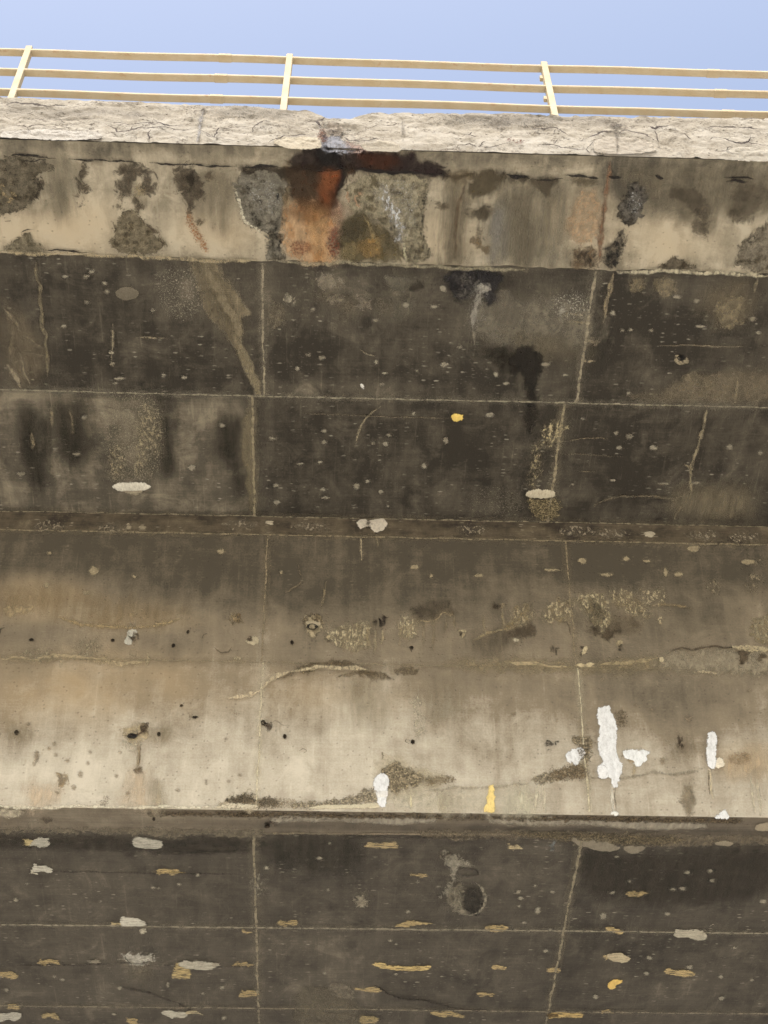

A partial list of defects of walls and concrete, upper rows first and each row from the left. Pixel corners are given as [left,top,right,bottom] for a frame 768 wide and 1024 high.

spalling [3,229,42,253]
spalling [0,153,54,222]
spalling [109,163,168,256]
spalling [173,161,211,252]
spalling [231,165,290,263]
rust [282,146,449,264]
spalling [570,182,648,270]
spalling [734,221,768,273]
water stain [0,251,261,398]
water stain [484,345,568,489]
spalling [217,791,279,812]